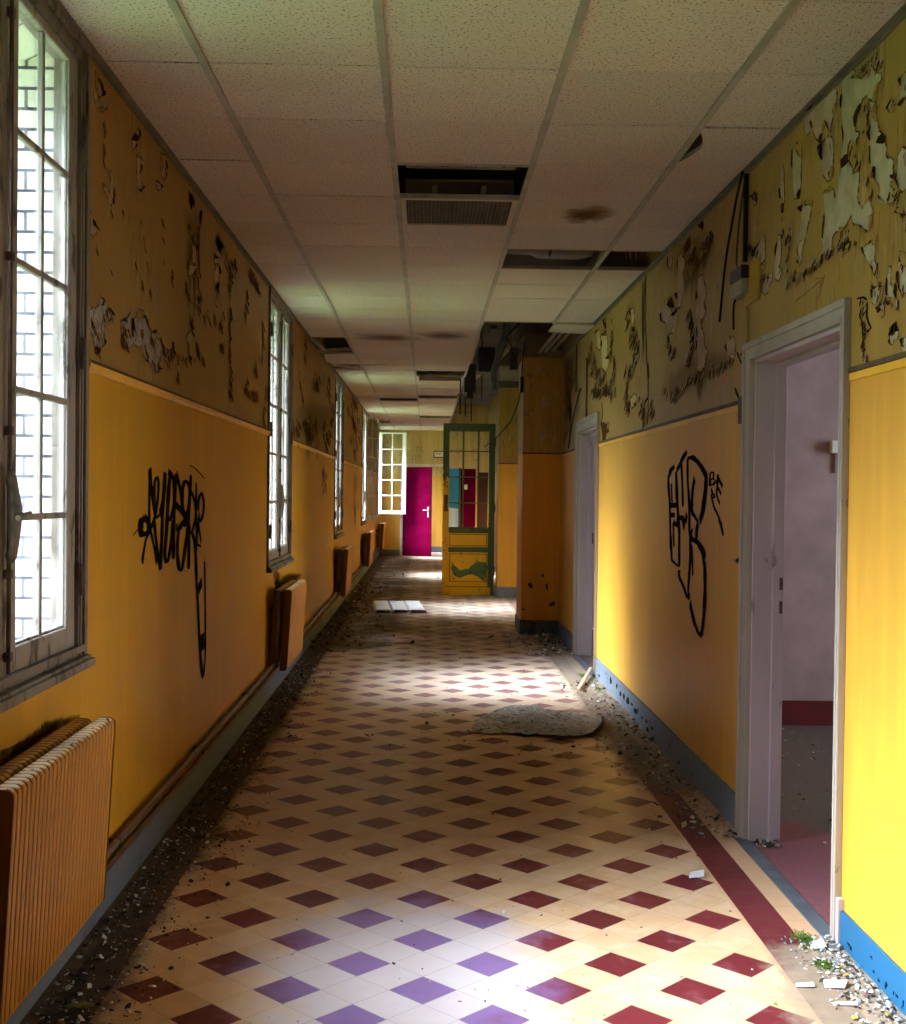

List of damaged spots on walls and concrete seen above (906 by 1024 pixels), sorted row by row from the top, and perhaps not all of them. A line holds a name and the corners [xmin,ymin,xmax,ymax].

water stain [568,208,608,222]
peeling [746,53,906,369]
peeling [89,221,268,428]
peeling [587,219,736,429]
peeling [289,337,335,453]
peeling [347,397,362,461]
spalling [601,422,609,440]
peeling [451,561,488,581]